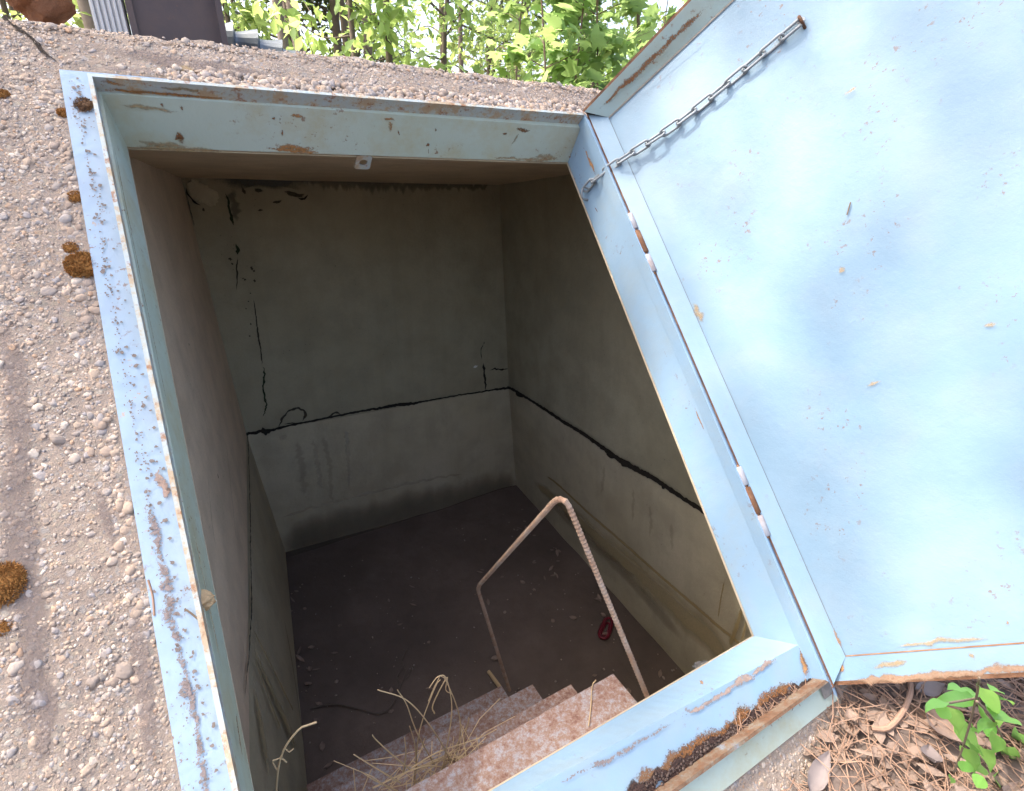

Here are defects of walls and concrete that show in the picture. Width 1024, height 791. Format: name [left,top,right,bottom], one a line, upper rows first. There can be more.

corrosion [606,13,702,103]
corrosion [106,79,222,112]
corrosion [143,132,215,151]
corrosion [269,130,318,154]
crack [226,195,704,693]
corrosion [904,637,980,646]
corrosion [858,660,1024,685]
corrosion [627,651,811,791]